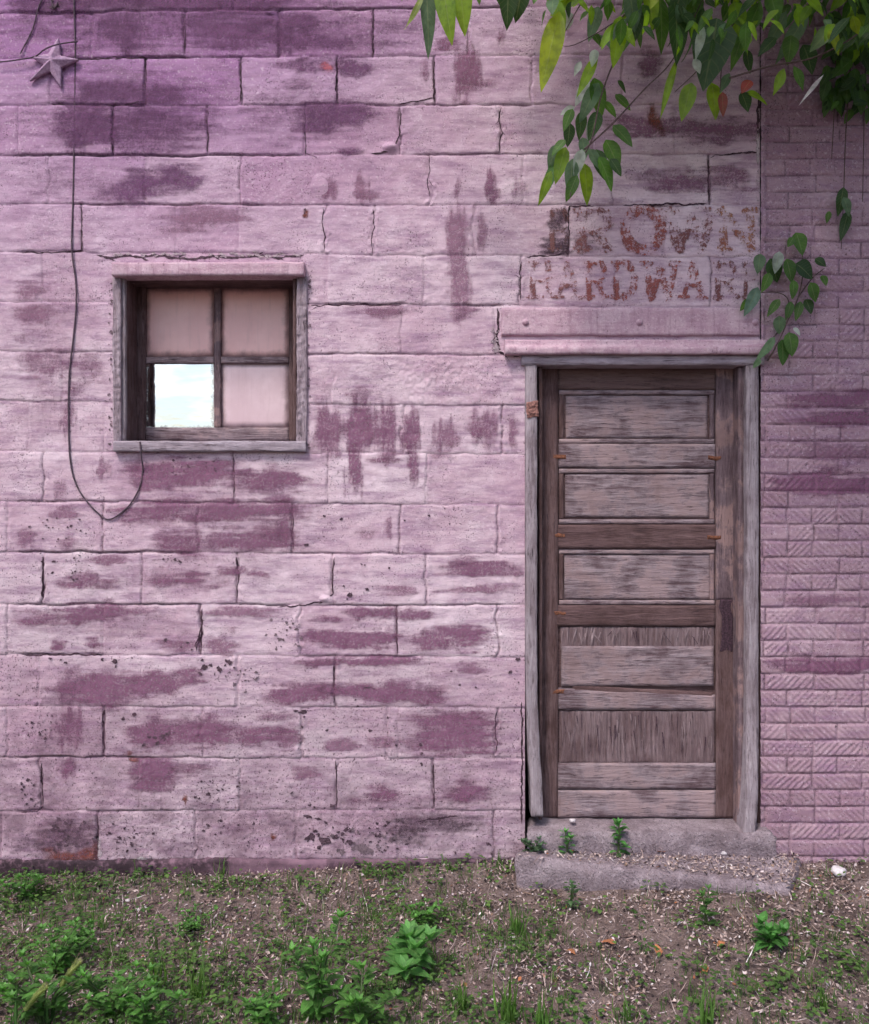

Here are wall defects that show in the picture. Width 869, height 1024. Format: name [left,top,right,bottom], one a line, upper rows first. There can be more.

leakage [436,38,488,103]
leakage [101,163,203,206]
crack [24,206,326,261]
leakage [446,210,487,321]
crack [493,205,593,357]
leakage [315,389,420,491]
leakage [469,412,518,445]
leakage [770,442,869,496]
leakage [786,389,869,428]
leakage [302,586,488,673]
leakage [47,668,205,779]
leakage [127,681,496,791]